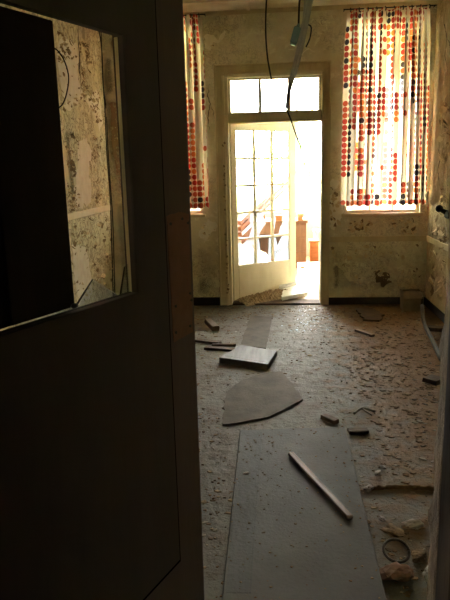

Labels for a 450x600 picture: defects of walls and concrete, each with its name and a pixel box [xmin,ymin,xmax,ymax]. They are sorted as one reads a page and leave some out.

peeling [57,31,108,212]
peeling [330,179,344,230]
peeling [428,181,449,302]